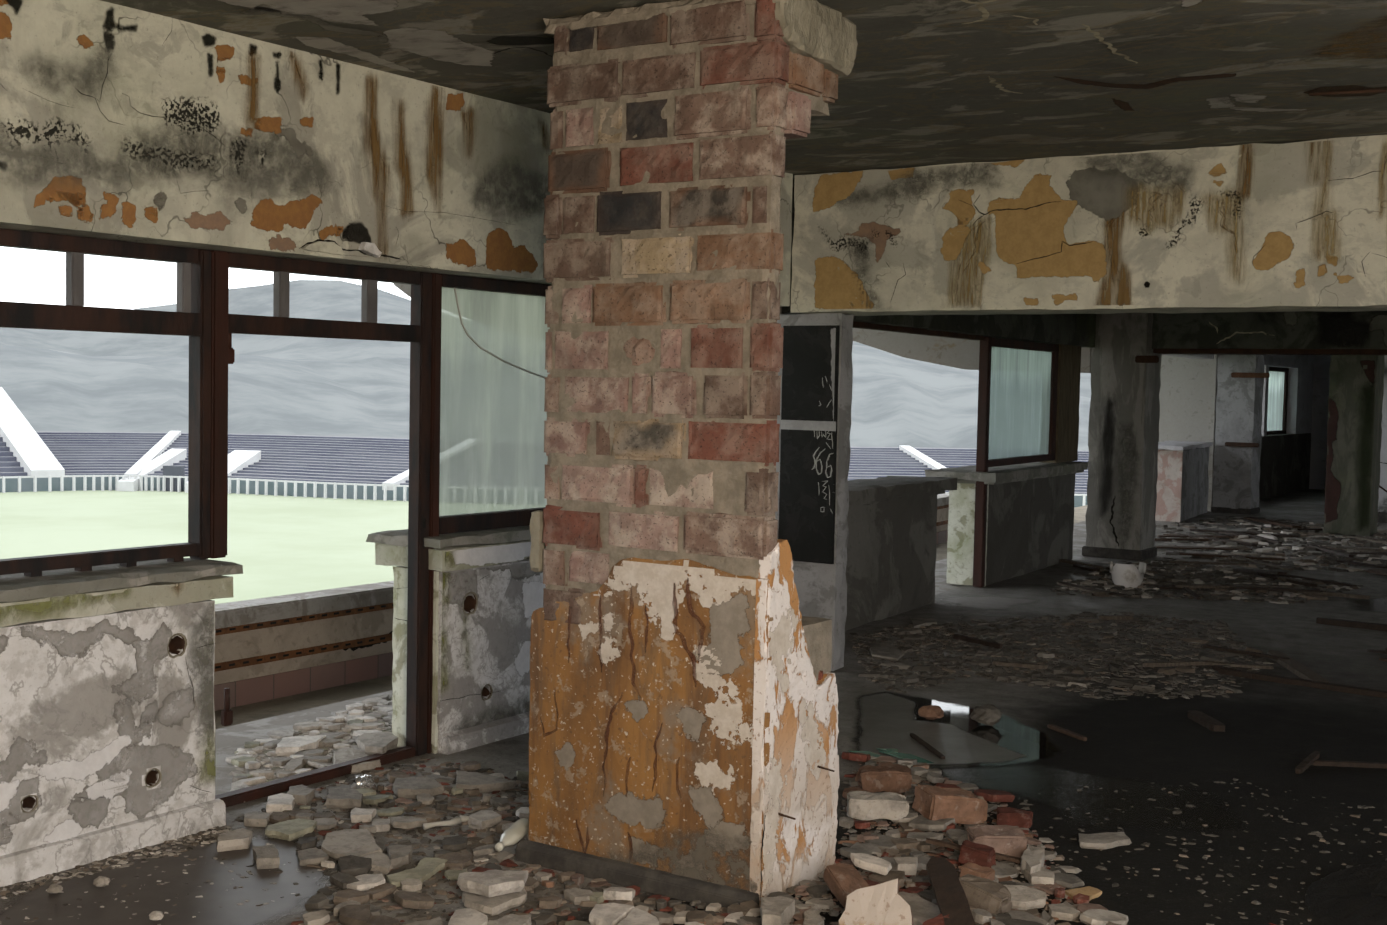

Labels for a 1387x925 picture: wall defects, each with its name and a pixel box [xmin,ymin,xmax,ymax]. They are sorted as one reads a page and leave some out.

peeling [0,0,12,40]
rust [1054,73,1236,111]
peeling [34,175,167,228]
damp [0,97,327,190]
peeling [183,194,402,260]
rust [366,77,443,254]
peeling [446,228,538,273]
peeling [940,167,1138,306]
damp [1088,152,1202,249]
damp [192,613,214,735]
damp [461,693,559,737]
peeling [578,560,788,897]